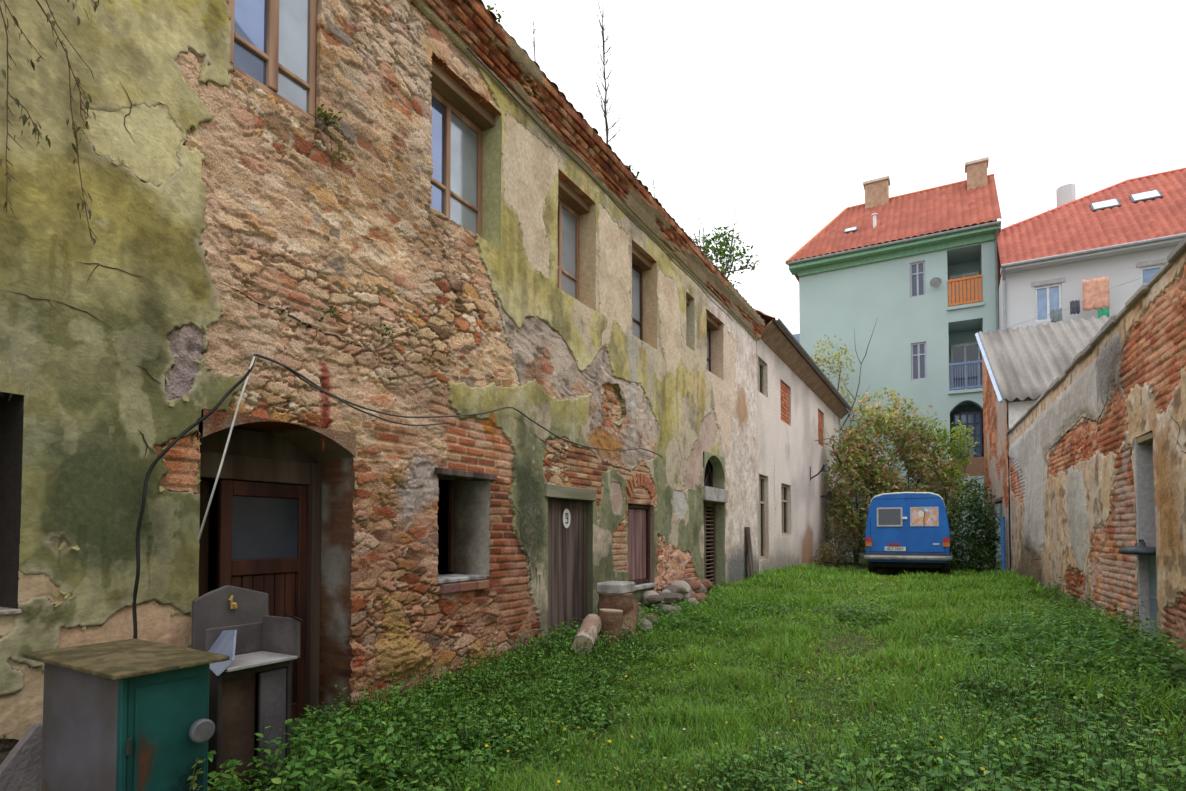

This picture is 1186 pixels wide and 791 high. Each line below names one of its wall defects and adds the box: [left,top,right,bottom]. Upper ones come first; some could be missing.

crack [119,80,142,143]
crack [0,261,144,329]
peeling [657,267,681,376]
spalling [82,0,659,717]
peeling [671,324,737,519]
water stain [737,391,747,423]
peeling [1008,257,1186,628]
peeling [18,571,75,607]
spalling [653,533,699,606]
spalling [1162,591,1186,660]
spalling [0,659,44,740]